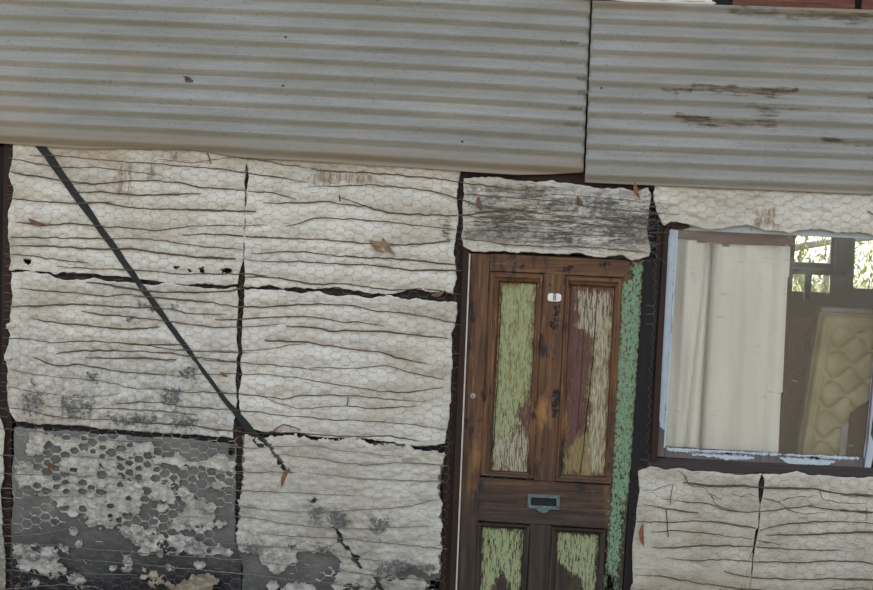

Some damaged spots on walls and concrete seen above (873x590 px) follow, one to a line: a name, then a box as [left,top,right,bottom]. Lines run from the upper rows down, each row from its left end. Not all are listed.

rust [673,84,797,97]
mould [21,378,48,417]
mould [61,390,96,422]
mould [107,411,157,430]
mould [160,364,199,431]
peeling [491,283,536,478]
peeling [11,428,446,590]
peeling [480,527,524,590]
crack [655,472,867,584]